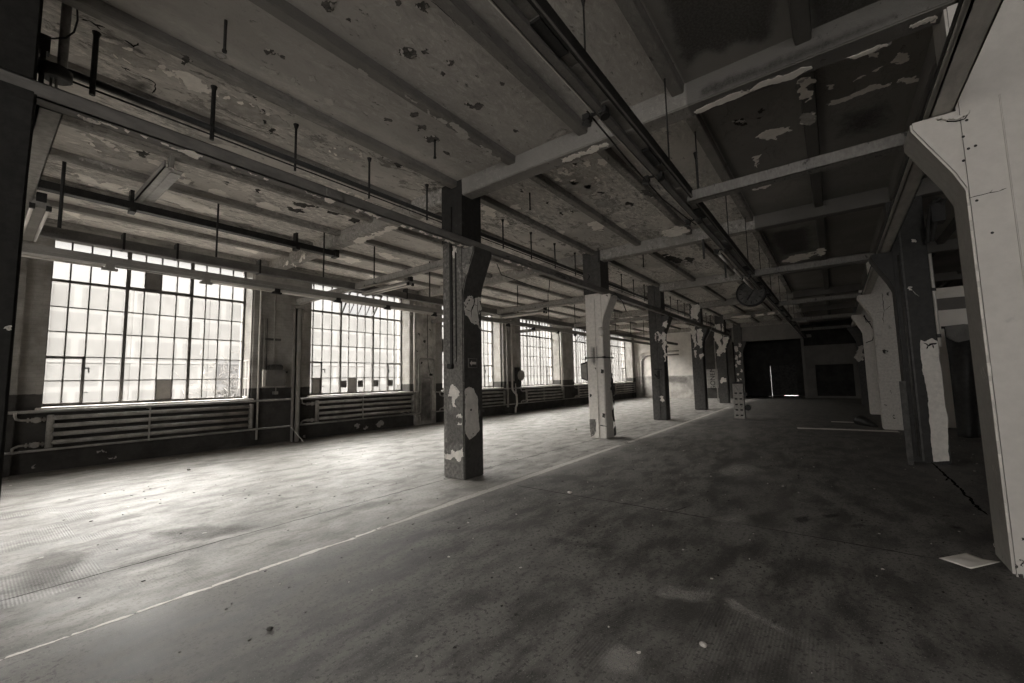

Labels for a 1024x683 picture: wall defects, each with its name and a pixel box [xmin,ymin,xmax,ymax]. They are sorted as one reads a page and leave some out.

peeling [909,15,938,28]
peeling [694,41,919,140]
peeling [557,143,609,194]
peeling [661,226,690,237]
peeling [782,248,826,263]
peeling [464,296,482,330]
peeling [655,321,668,362]
peeling [689,304,774,383]
peeling [444,384,480,462]
peeling [920,338,949,462]
crack [932,463,988,515]